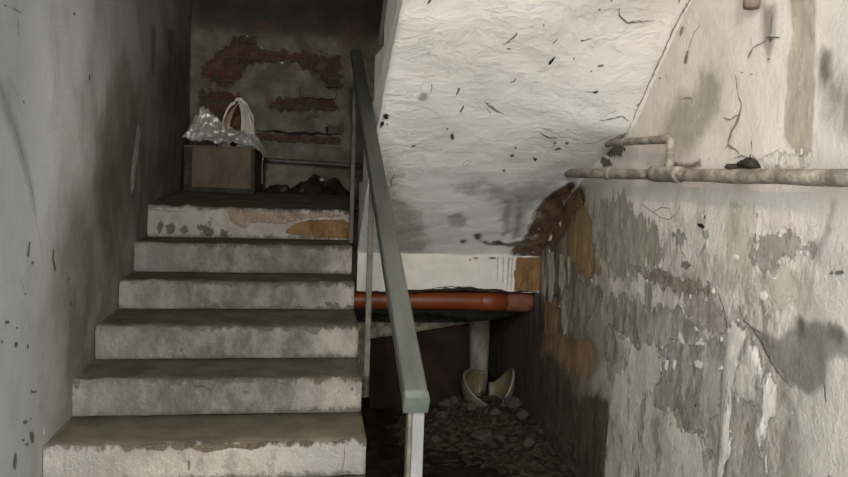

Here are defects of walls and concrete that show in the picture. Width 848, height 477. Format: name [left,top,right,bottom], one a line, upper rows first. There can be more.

flaking render [198,35,345,145]
crack [588,0,690,144]
crack [680,76,756,160]
crack [747,20,780,60]
leakage [785,0,814,154]
peeling [157,221,228,237]
peeling [227,209,342,228]
corrosion [511,182,601,291]
peeling [748,227,817,279]
peeling [542,189,726,477]
crack [718,293,792,387]
peeling [141,443,260,453]